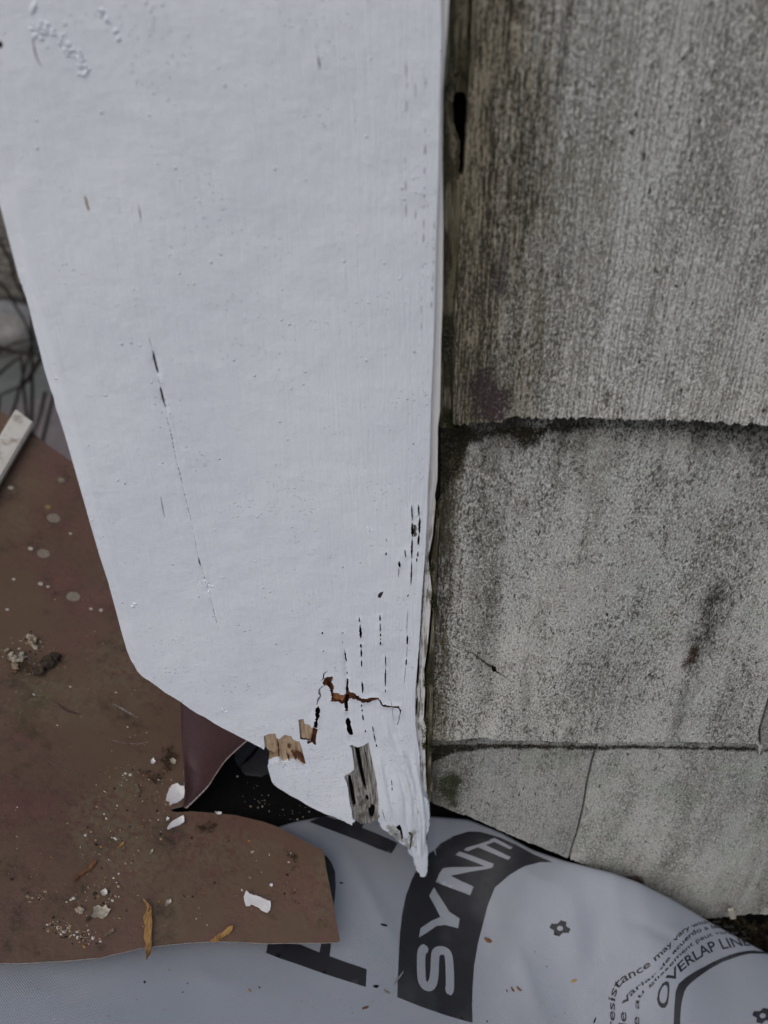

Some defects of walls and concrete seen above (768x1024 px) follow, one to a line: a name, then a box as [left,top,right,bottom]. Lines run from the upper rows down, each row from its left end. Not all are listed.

crack [317,504,427,819]
damp [690,584,727,671]